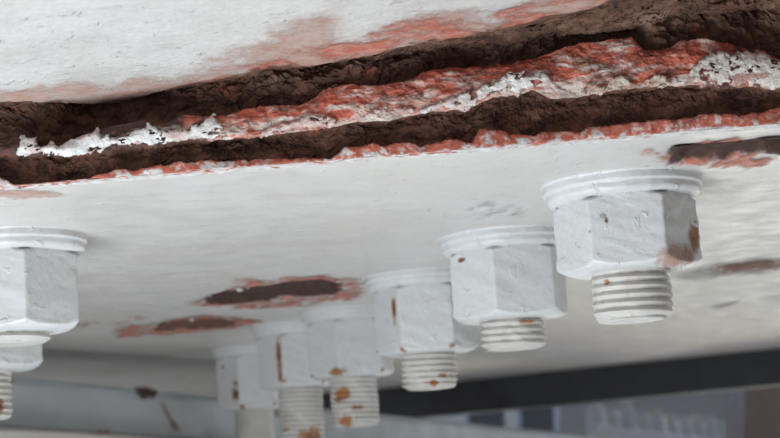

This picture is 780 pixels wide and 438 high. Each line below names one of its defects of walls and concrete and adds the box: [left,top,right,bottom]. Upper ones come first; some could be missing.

corrosion [0,0,612,105]
peeling [0,37,780,157]
corrosion [0,85,780,189]
peeling [0,107,780,199]
corrosion [656,222,699,269]
corrosion [298,428,319,438]
corrosion [334,387,363,427]